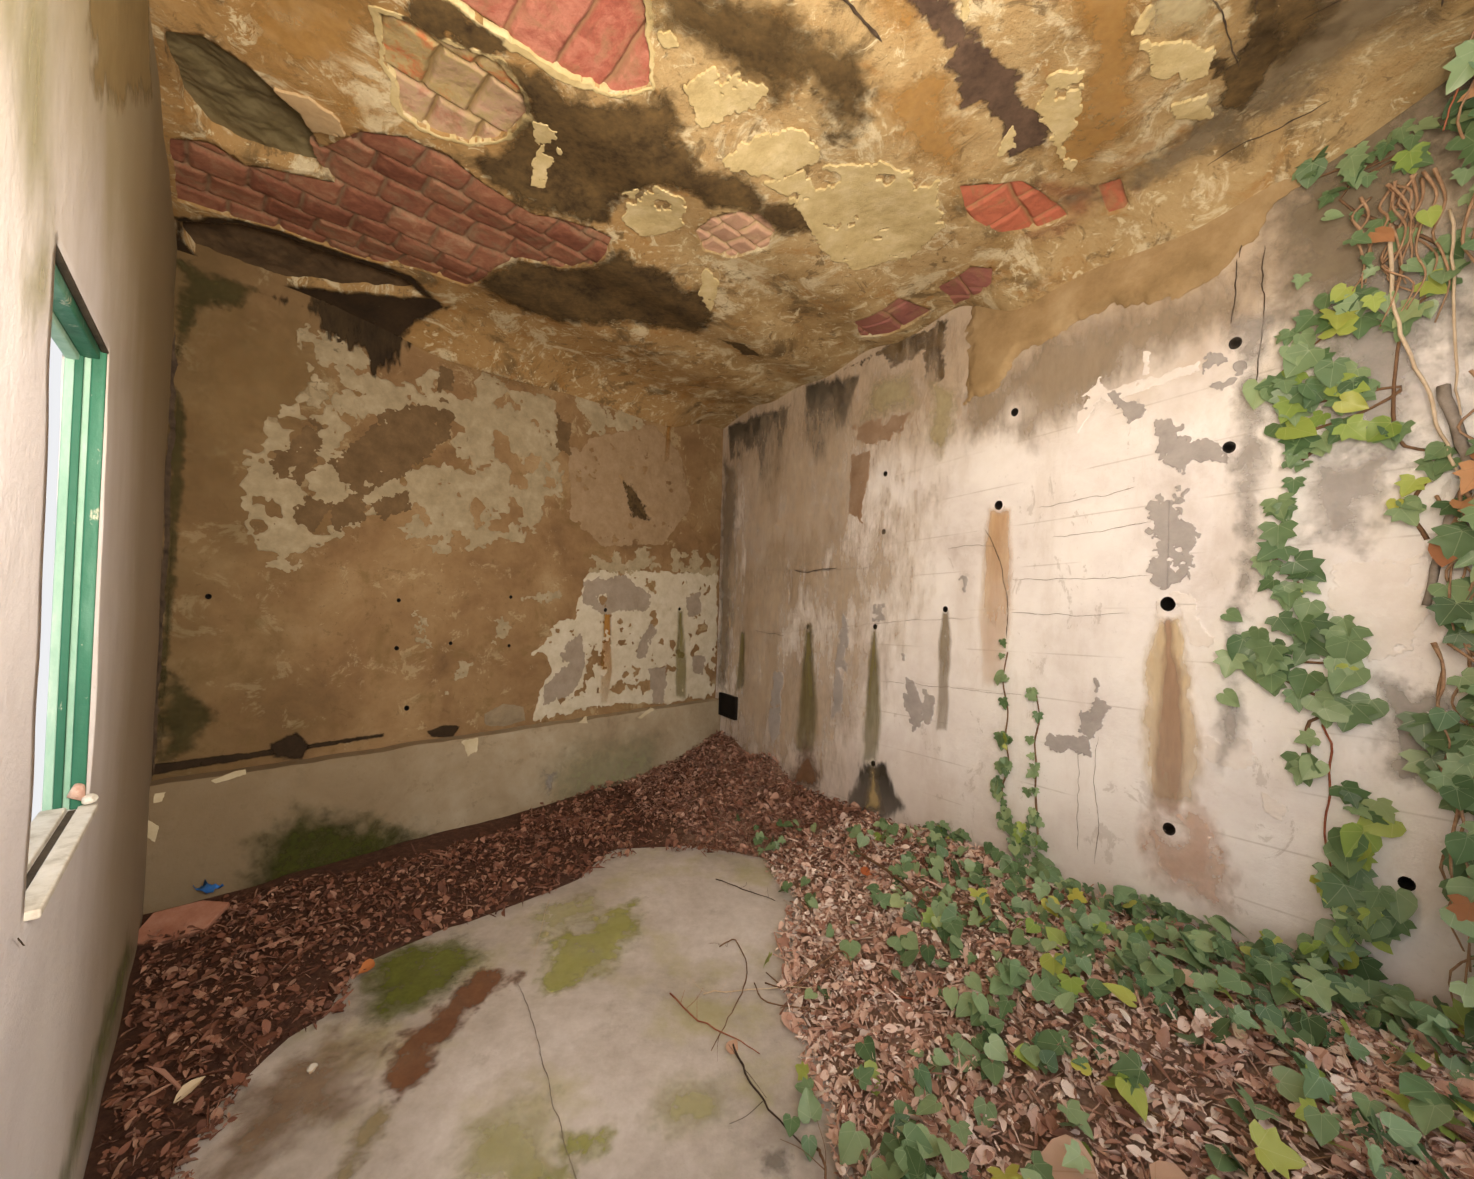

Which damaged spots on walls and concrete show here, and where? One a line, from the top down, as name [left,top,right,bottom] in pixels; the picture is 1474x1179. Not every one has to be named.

spalling [368,0,679,188]
leakage [481,251,713,333]
leakage [402,0,812,236]
leakage [657,0,959,172]
flaking render [722,127,946,270]
crack [843,0,882,42]
peeling [239,323,719,723]
leakage [718,320,955,818]
corrosion [986,511,1009,602]
peeling [1075,351,1247,648]
corrosion [1145,620,1224,901]
crack [518,984,577,1179]